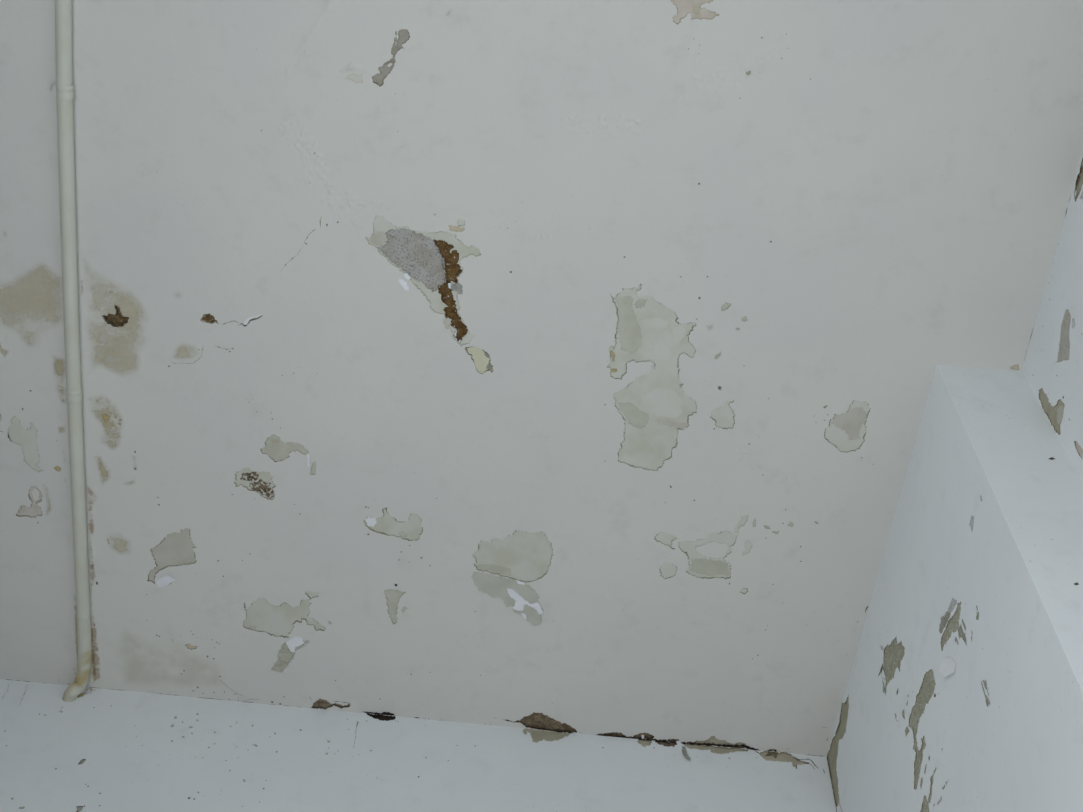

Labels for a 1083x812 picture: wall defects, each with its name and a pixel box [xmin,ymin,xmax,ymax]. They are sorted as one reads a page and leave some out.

flaking render [372,29,410,87]
damp [96,294,139,370]
flaking render [365,215,494,374]
peeling [607,284,697,471]
flaking render [234,435,316,500]
peeling [471,530,554,625]
peeling [939,599,973,651]
flaking render [312,699,350,710]
flaking render [363,711,396,721]
flaking render [506,712,580,743]
flaking render [638,694,849,811]
peeling [878,637,948,812]